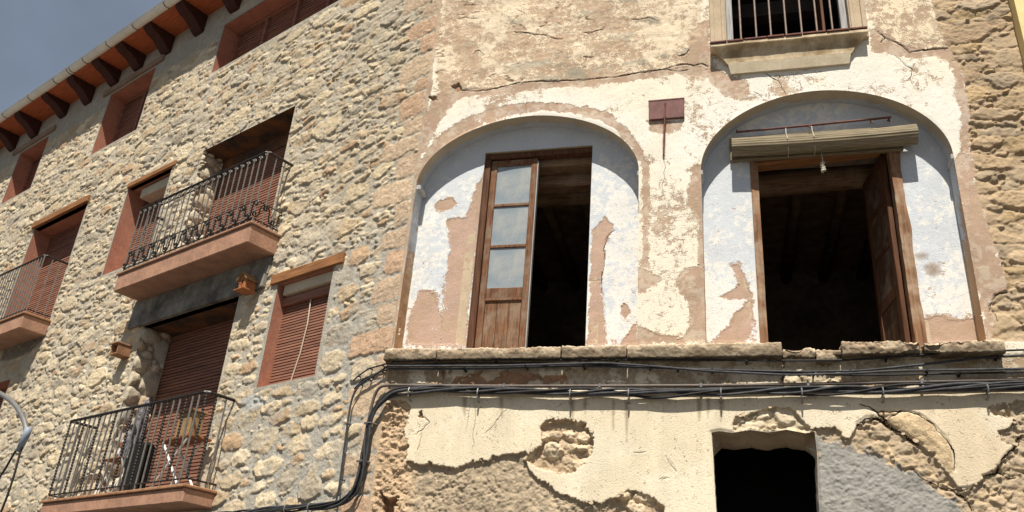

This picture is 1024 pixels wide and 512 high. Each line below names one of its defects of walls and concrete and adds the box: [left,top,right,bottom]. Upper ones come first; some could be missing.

crack [461,50,707,113]
crack [880,34,939,82]
peeling [408,22,749,293]
peeling [392,178,483,347]
peeling [587,216,614,345]
peeling [620,165,755,345]
spalling [368,399,664,512]
spalling [732,400,1024,512]
crack [858,404,1022,511]